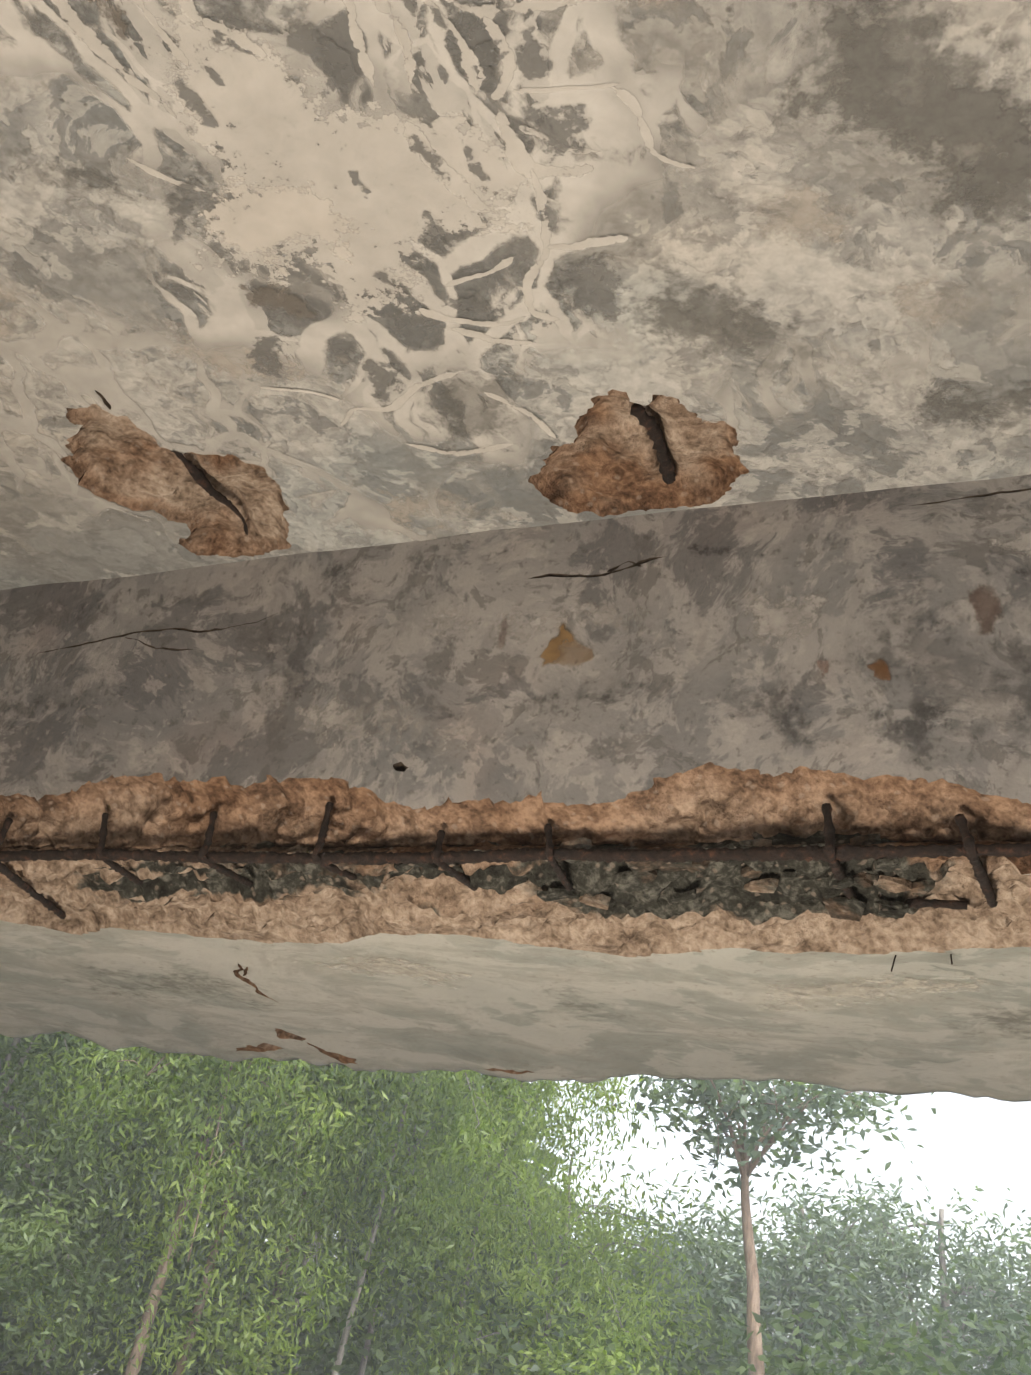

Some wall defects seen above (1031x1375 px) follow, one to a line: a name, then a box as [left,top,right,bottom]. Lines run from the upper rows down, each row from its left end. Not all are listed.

damp [782,0,1031,233]
damp [0,0,703,541]
spalling [61,390,291,558]
spalling [528,389,749,517]
damp [645,285,848,428]
crack [912,488,1031,506]
damp [918,381,1031,426]
crack [35,614,275,654]
spalling [0,762,1031,972]